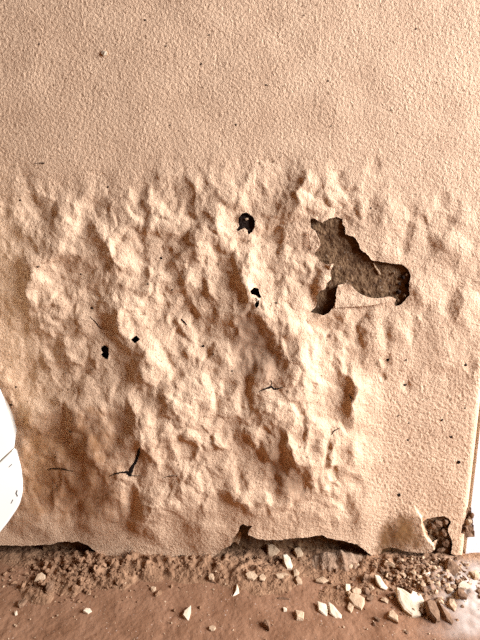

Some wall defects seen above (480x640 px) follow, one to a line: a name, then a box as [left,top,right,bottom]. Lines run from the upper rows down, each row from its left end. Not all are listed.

spalling [308,217,410,315]
crack [109,446,141,477]
spalling [423,516,452,553]
spalling [461,507,475,538]
peeling [224,524,363,585]